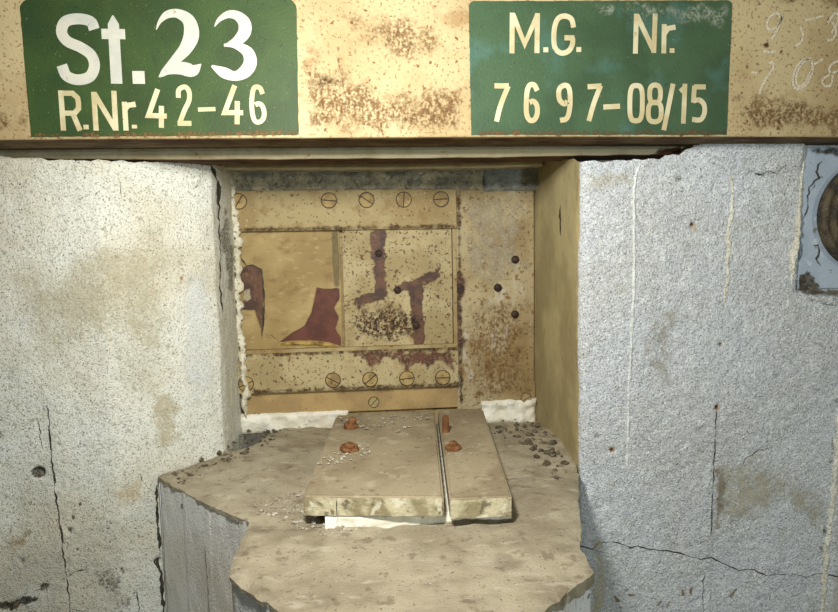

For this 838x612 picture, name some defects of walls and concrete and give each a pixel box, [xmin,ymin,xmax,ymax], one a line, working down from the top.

corrosion [354,229,442,344]
crack [38,405,87,612]
crack [710,411,718,533]
crack [581,542,838,612]